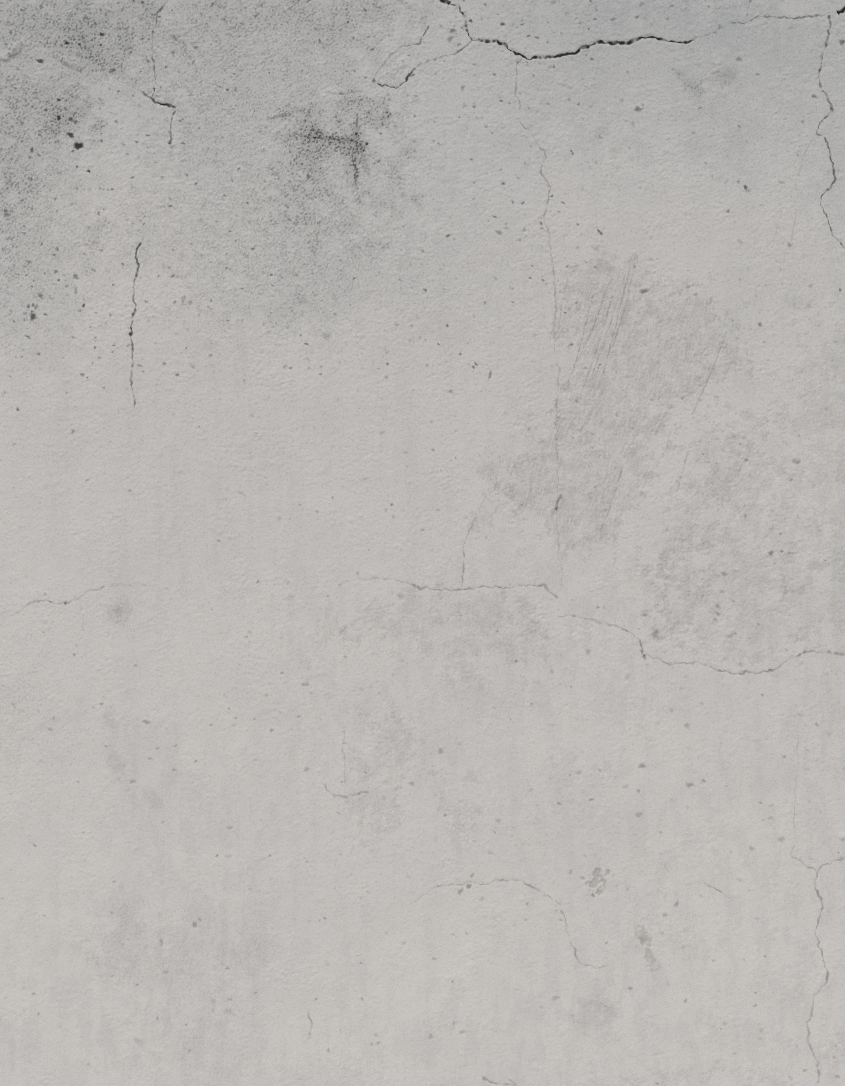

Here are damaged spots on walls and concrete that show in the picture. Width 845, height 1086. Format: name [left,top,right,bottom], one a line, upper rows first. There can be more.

crack [440,0,692,60]